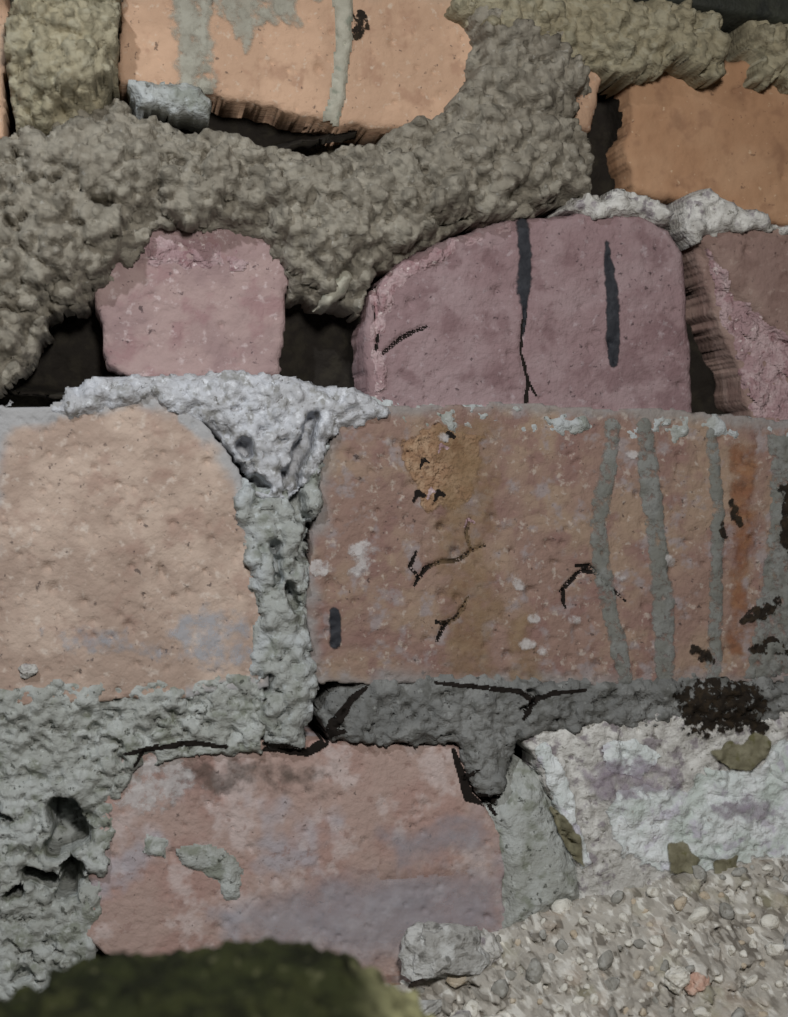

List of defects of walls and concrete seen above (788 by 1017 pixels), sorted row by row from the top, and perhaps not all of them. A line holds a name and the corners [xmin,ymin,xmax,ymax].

crack [520,310,537,403]
leakage [310,560,328,576]
leakage [350,542,368,575]
crack [408,517,486,587]
crack [559,563,626,609]
crack [435,596,469,642]